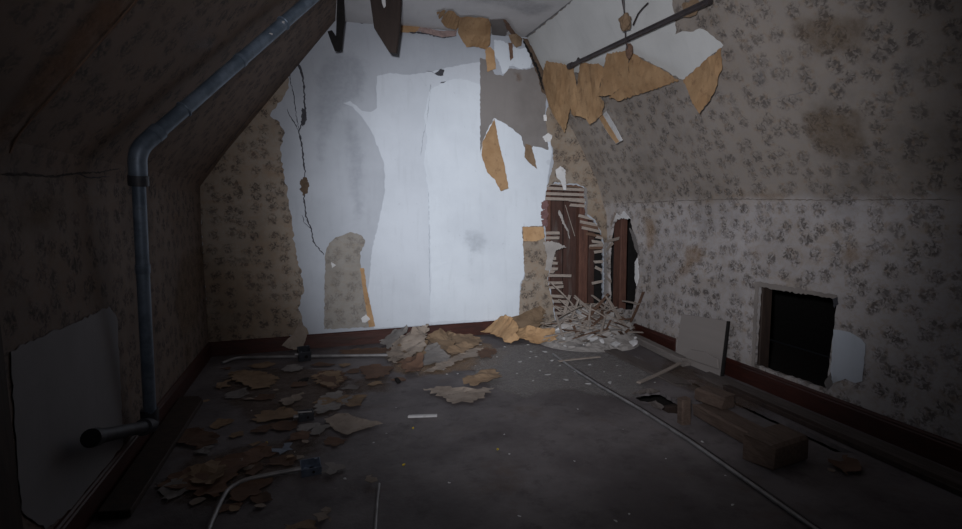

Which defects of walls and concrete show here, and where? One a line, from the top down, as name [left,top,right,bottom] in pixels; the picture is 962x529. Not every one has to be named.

peeling [360,268,375,327]